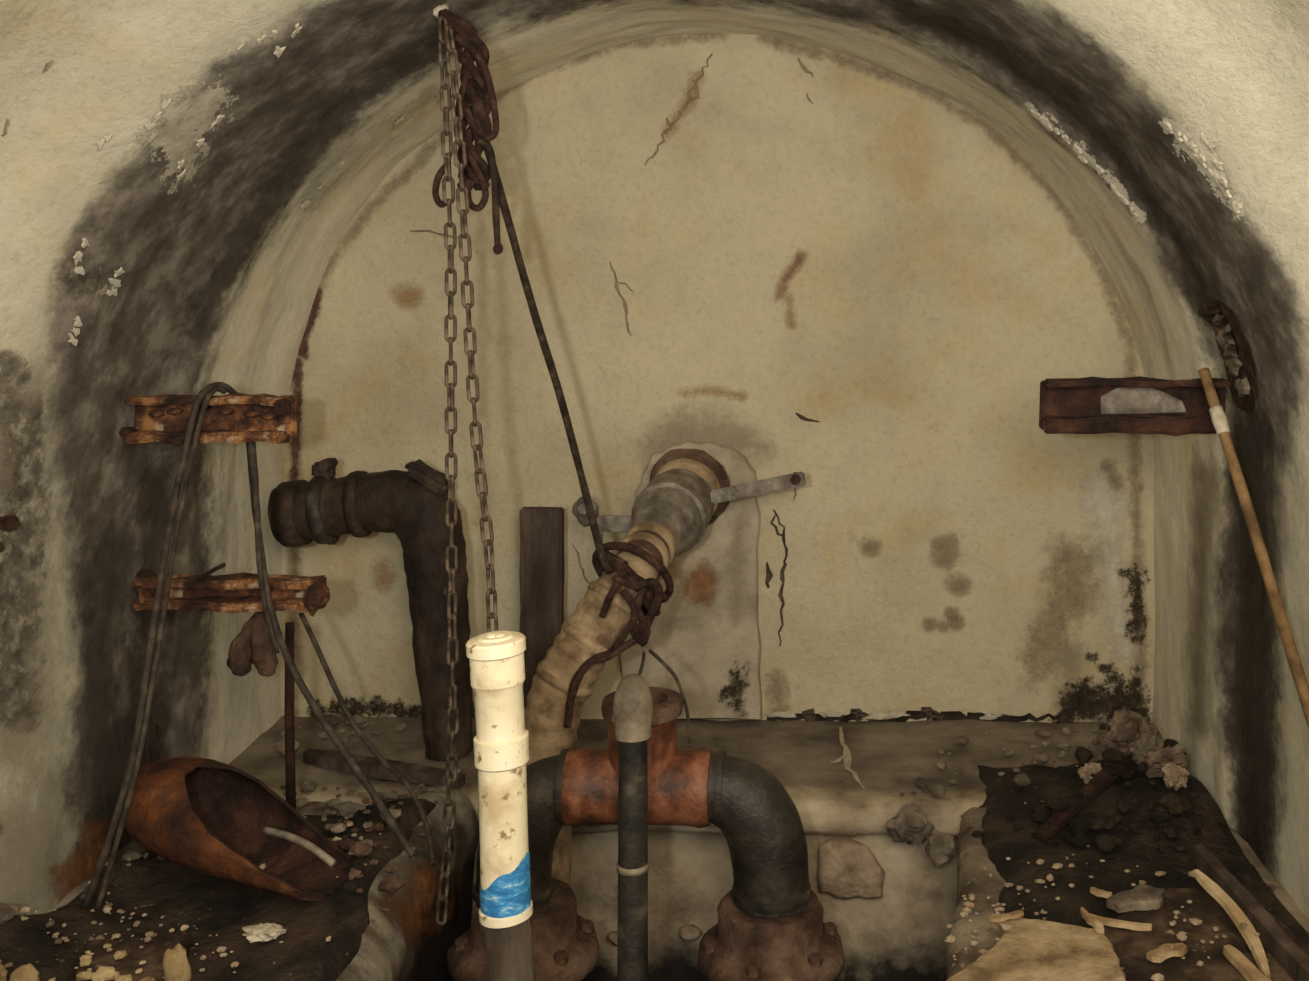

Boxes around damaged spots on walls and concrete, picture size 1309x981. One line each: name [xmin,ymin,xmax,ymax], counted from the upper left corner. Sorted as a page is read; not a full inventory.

crack [644,54,713,166]
rust [777,253,804,326]
spalling [1198,300,1258,414]
damp [0,0,615,860]
damp [747,0,1300,874]
spalling [0,515,21,552]
crack [765,488,797,646]
damp [719,662,749,716]
crack [764,707,1057,789]